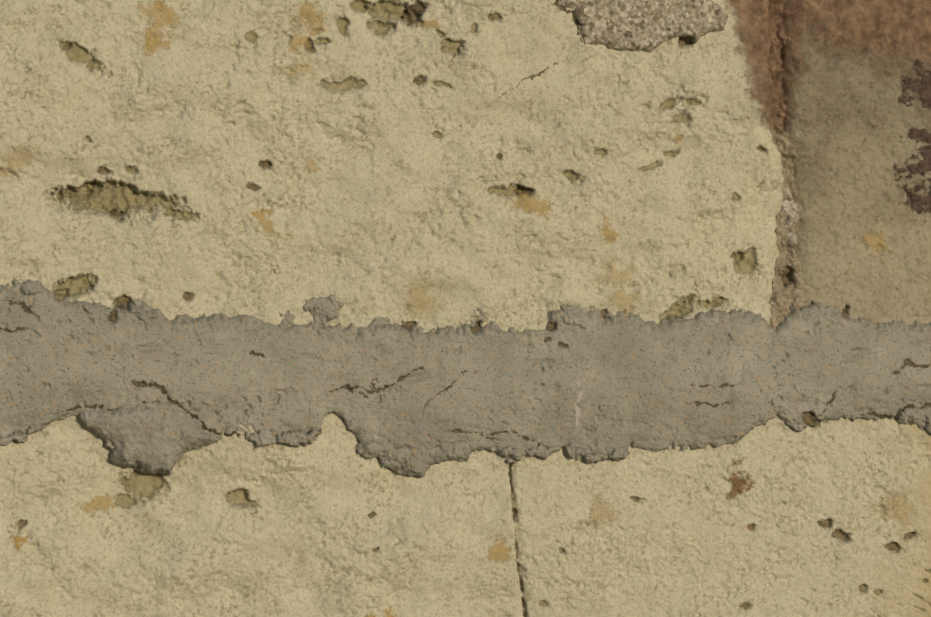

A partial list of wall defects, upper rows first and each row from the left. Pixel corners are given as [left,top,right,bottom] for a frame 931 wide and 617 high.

peeling [899,59,931,108]
peeling [894,128,931,214]
crack [132,381,243,438]
crack [448,428,545,447]
crack [508,463,527,617]